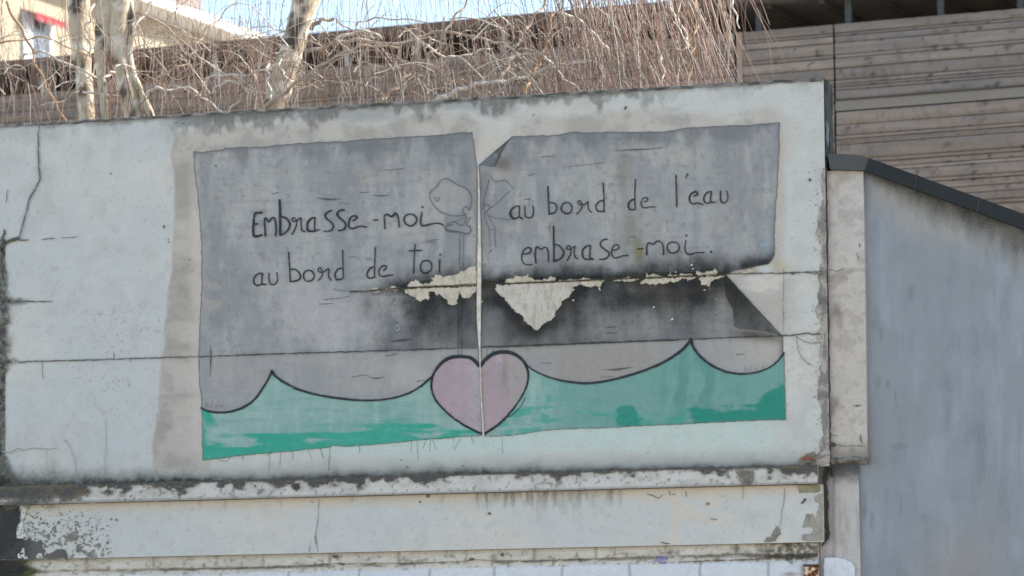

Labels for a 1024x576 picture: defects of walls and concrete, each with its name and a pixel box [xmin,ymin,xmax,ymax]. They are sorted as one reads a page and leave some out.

crack [1,127,75,281]
peeling [366,266,483,306]
peeling [495,264,756,331]
leakage [0,239,859,510]
peeling [0,505,117,561]
spalling [764,526,781,542]
spalling [801,494,823,541]